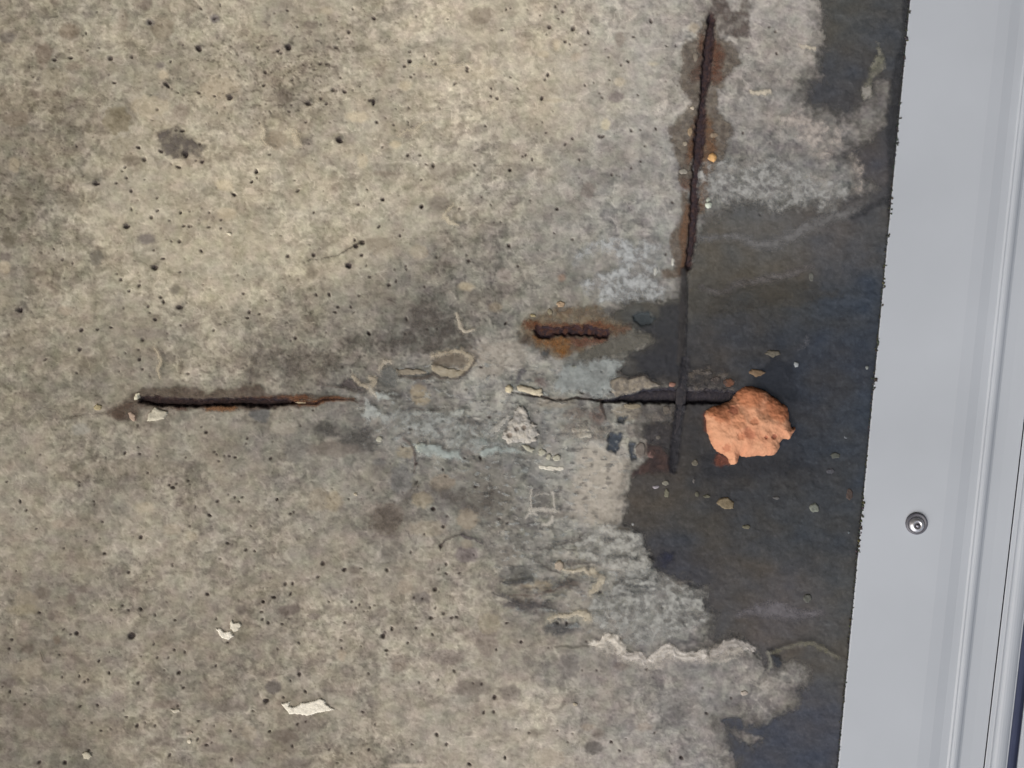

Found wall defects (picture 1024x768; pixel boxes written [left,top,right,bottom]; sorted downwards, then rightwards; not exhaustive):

corrosion [662,23,741,278]
spalling [534,324,610,339]
corrosion [520,306,652,360]
water stain [505,0,910,768]
corrosion [106,385,345,421]
corrosion [715,454,729,466]
peeling [281,698,334,716]